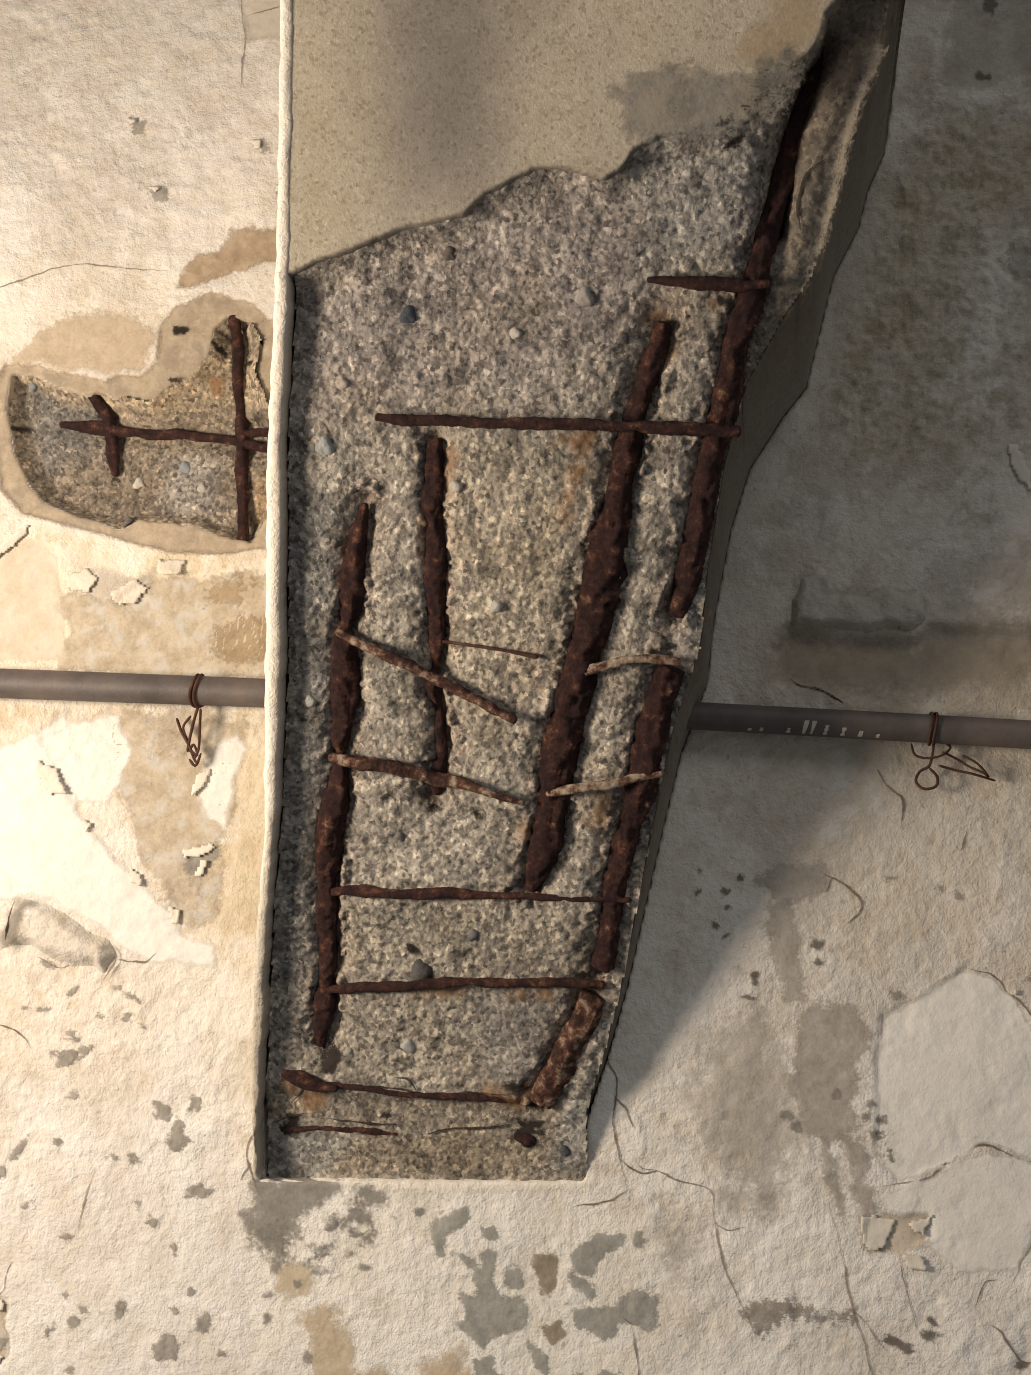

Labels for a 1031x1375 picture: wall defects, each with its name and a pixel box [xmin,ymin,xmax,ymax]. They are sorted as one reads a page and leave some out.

damp [612,46,804,143]
crack [1,263,166,287]
spalling [0,292,273,575]
spalling [265,0,889,1181]
peeling [0,712,215,967]
peeling [182,736,246,878]
crack [573,1062,752,1327]
damp [754,863,890,1222]
crack [830,1210,887,1375]
peeling [860,971,1031,1272]
crack [880,1143,1031,1187]
crack [976,1246,1031,1363]